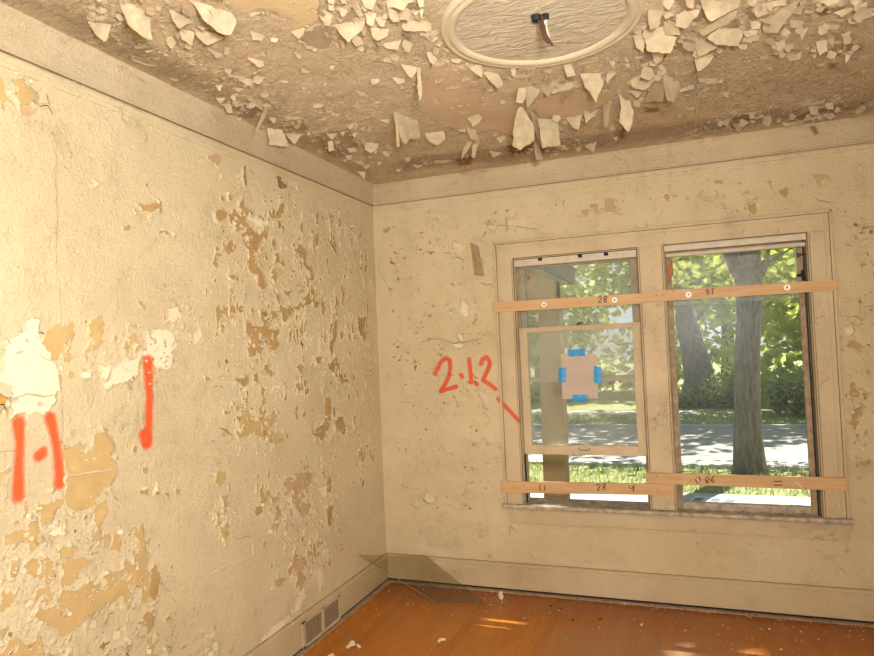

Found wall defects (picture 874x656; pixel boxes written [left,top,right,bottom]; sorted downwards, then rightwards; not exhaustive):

peeling [76,0,874,179]
peeling [0,152,495,656]
peeling [839,291,874,480]